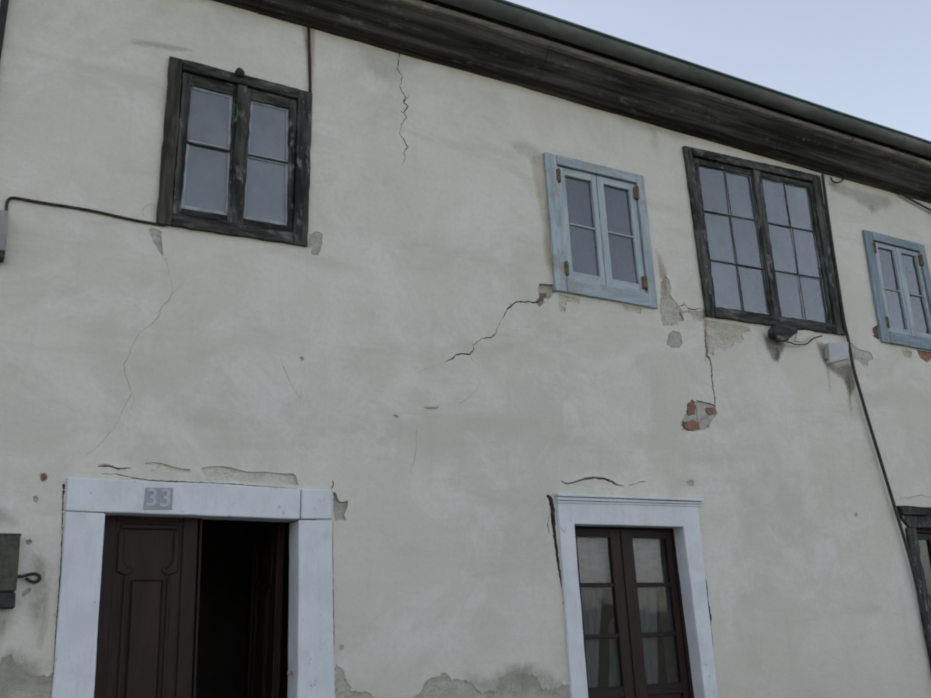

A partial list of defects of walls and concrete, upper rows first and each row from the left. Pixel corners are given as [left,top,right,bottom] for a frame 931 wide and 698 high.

crack [395,54,408,162]
peeling [660,276,750,356]
crack [424,299,539,403]
crack [676,301,716,404]
peeling [901,348,931,362]
peeling [681,399,716,431]
peeling [202,466,298,485]
peeling [332,490,347,521]
crack [546,494,563,594]
peeling [0,654,54,698]
peeling [334,665,376,698]
peeling [413,671,570,698]